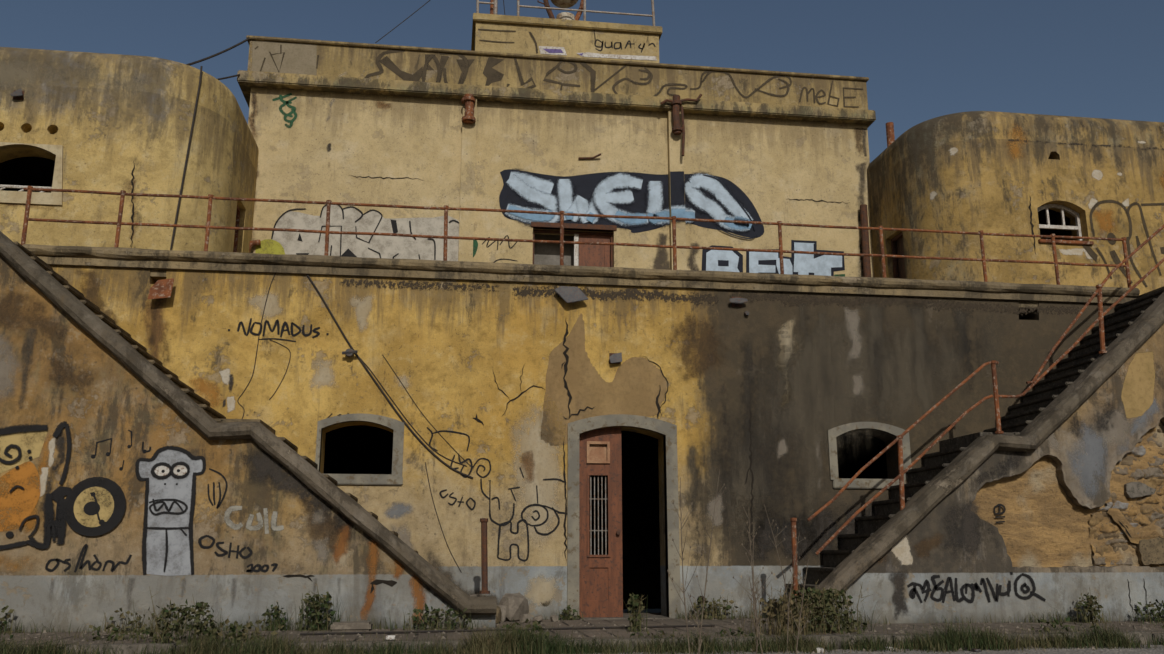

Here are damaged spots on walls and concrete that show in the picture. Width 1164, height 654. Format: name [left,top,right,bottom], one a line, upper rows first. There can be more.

spalling [340,278,498,330]
spalling [512,285,1079,315]
water stain [0,293,64,408]
water stain [50,360,91,412]
crack [473,320,594,561]
peeling [513,313,669,540]
peeling [778,439,787,456]
spalling [973,399,1164,568]
peeling [708,496,722,526]